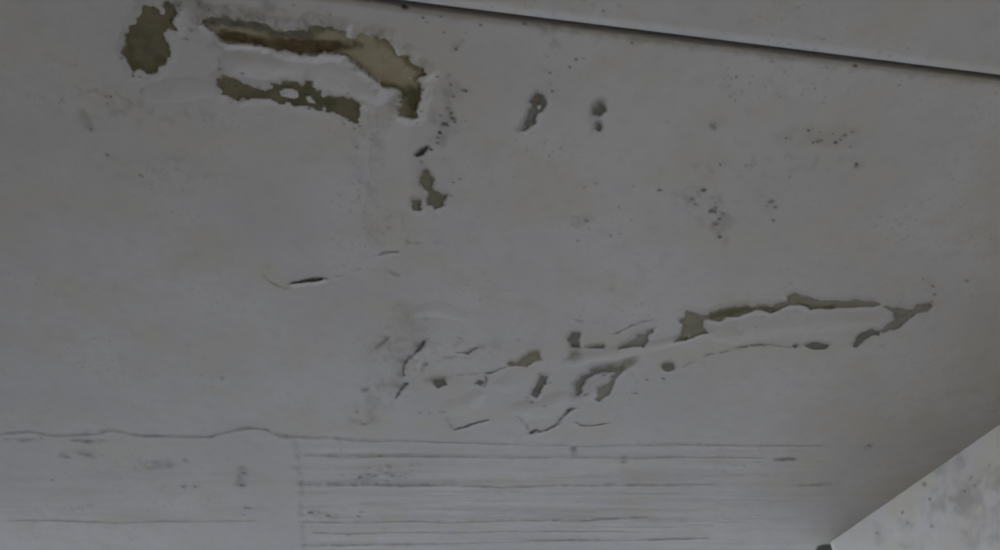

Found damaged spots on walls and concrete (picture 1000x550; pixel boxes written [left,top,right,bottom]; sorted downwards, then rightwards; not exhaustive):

peeling [114,0,441,129]
peeling [517,87,553,135]
peeling [588,100,610,135]
peeling [407,145,461,216]
crack [286,278,330,288]
peeling [668,288,937,352]
peeling [429,376,450,390]
peeling [503,348,553,401]
peeling [563,326,659,404]
spalling [658,360,678,379]